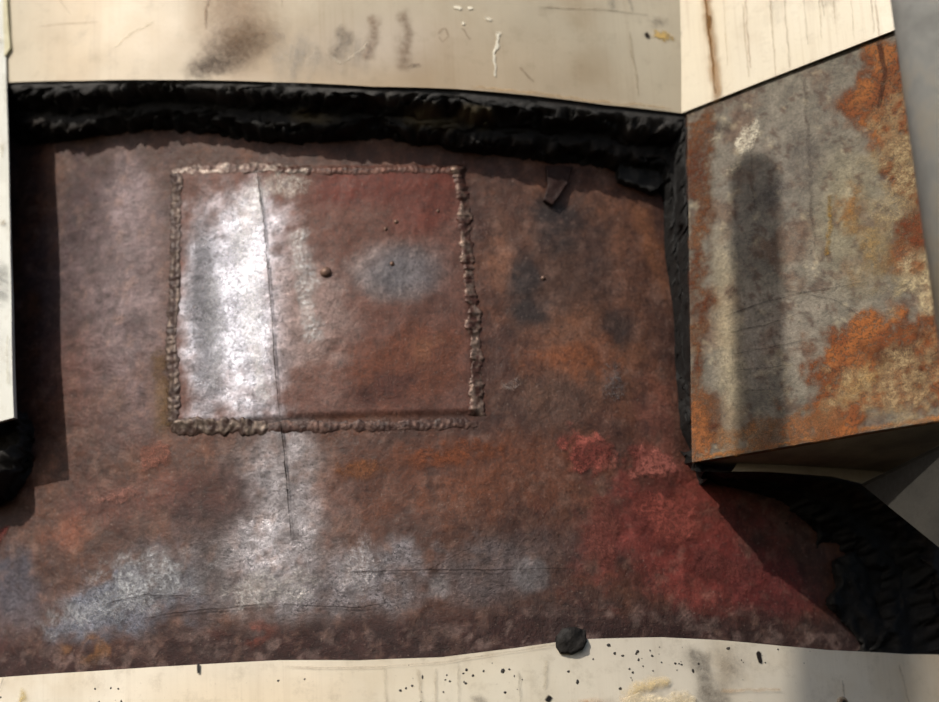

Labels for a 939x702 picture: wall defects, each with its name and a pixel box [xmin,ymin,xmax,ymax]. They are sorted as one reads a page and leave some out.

crack [258,179,278,400]
corrosion [687,41,939,461]
crack [280,425,291,533]